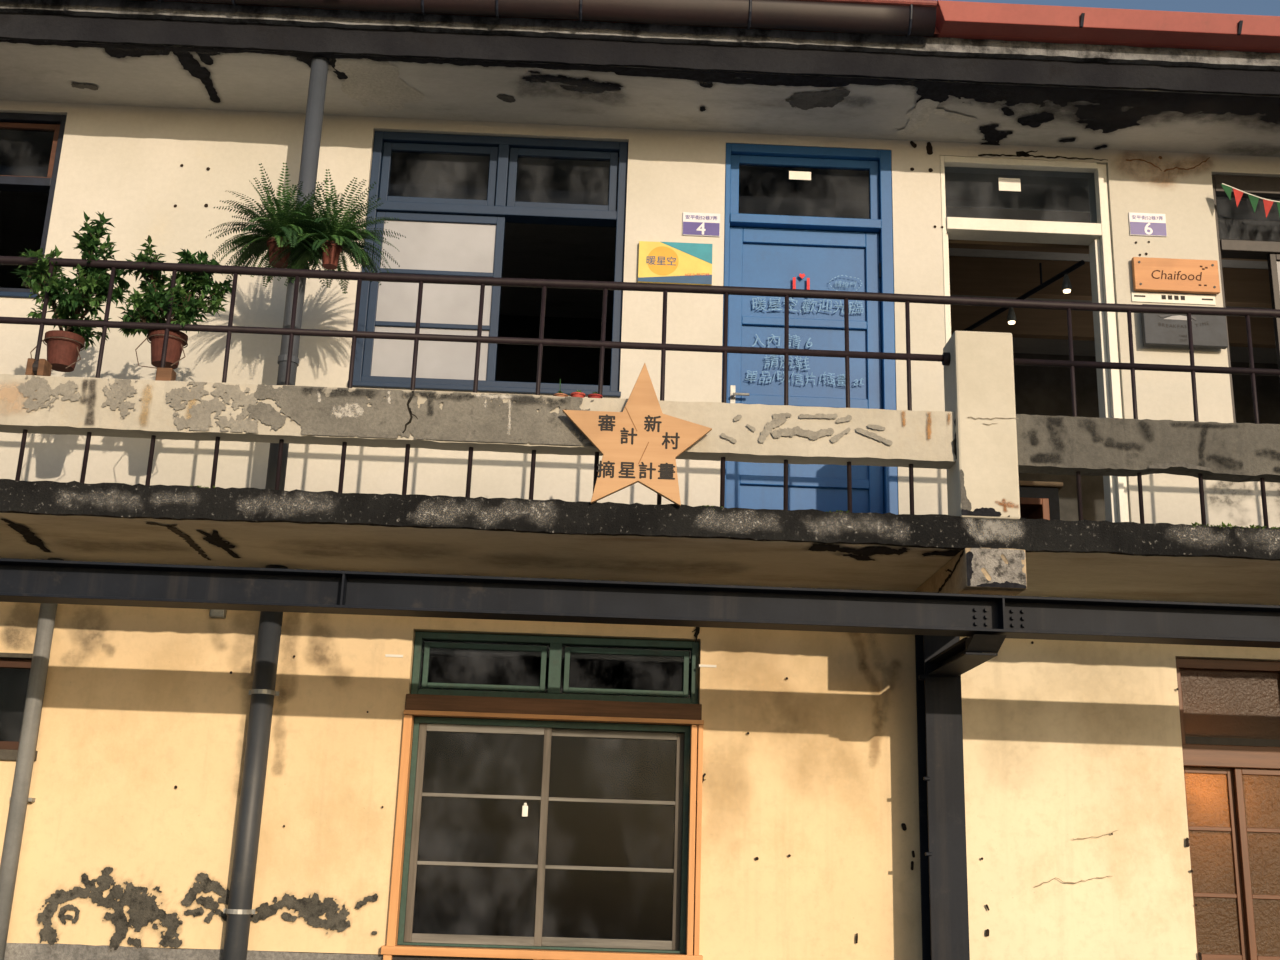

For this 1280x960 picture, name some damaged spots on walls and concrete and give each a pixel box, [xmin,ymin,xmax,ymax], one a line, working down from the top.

spalling [104,44,221,103]
spalling [785,87,850,110]
spalling [1001,107,1054,128]
peeling [17,375,81,412]
peeling [102,379,149,419]
peeling [166,382,594,446]
crack [402,391,418,433]
spalling [1,519,50,552]
spalling [196,530,241,558]
crack [1035,876,1113,887]
peeling [37,867,230,951]
peeling [250,892,378,933]